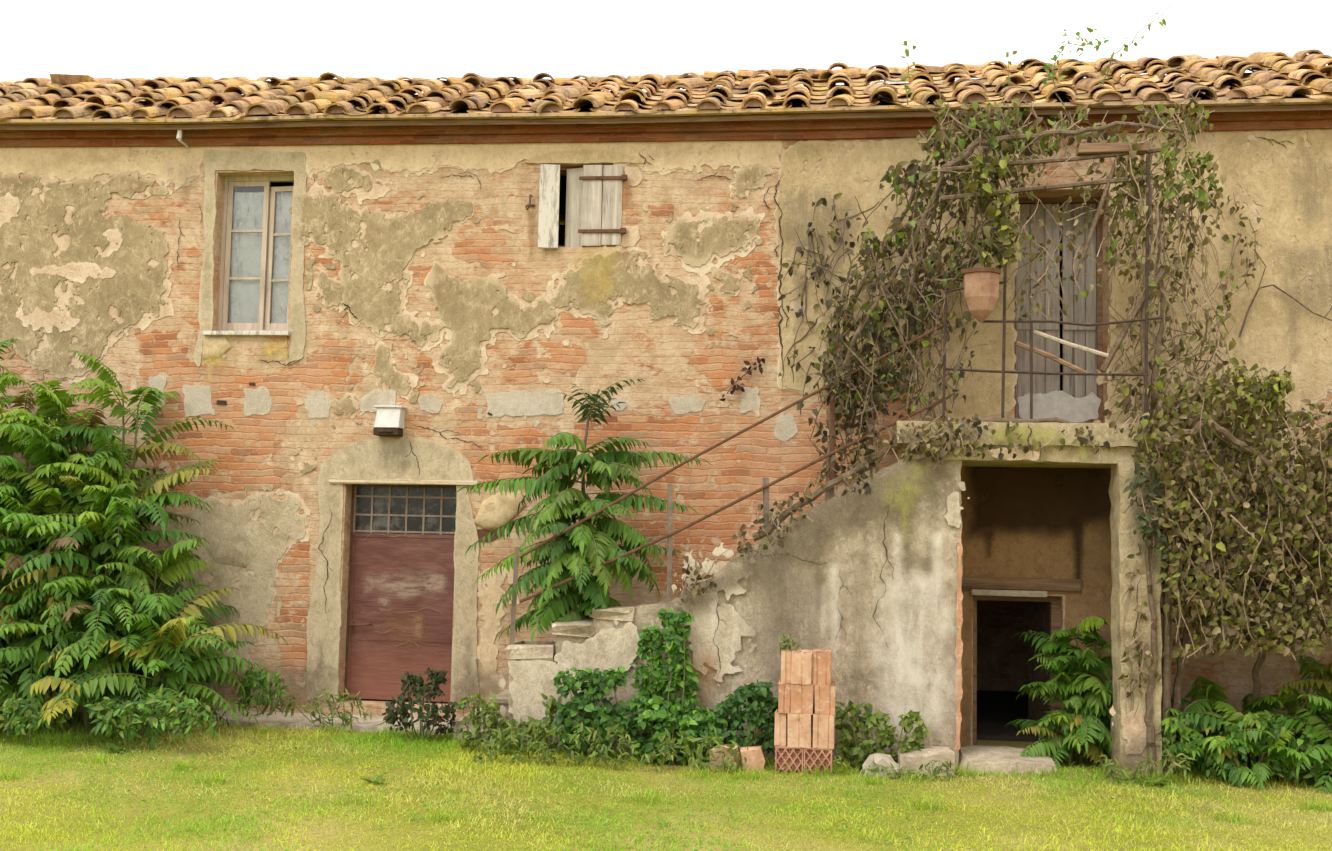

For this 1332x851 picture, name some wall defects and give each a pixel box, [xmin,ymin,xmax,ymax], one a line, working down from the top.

flaking render [0,129,1332,691]
spalling [477,551,640,725]
crack [749,499,894,680]
spalling [944,482,970,752]
spalling [1109,705,1158,755]